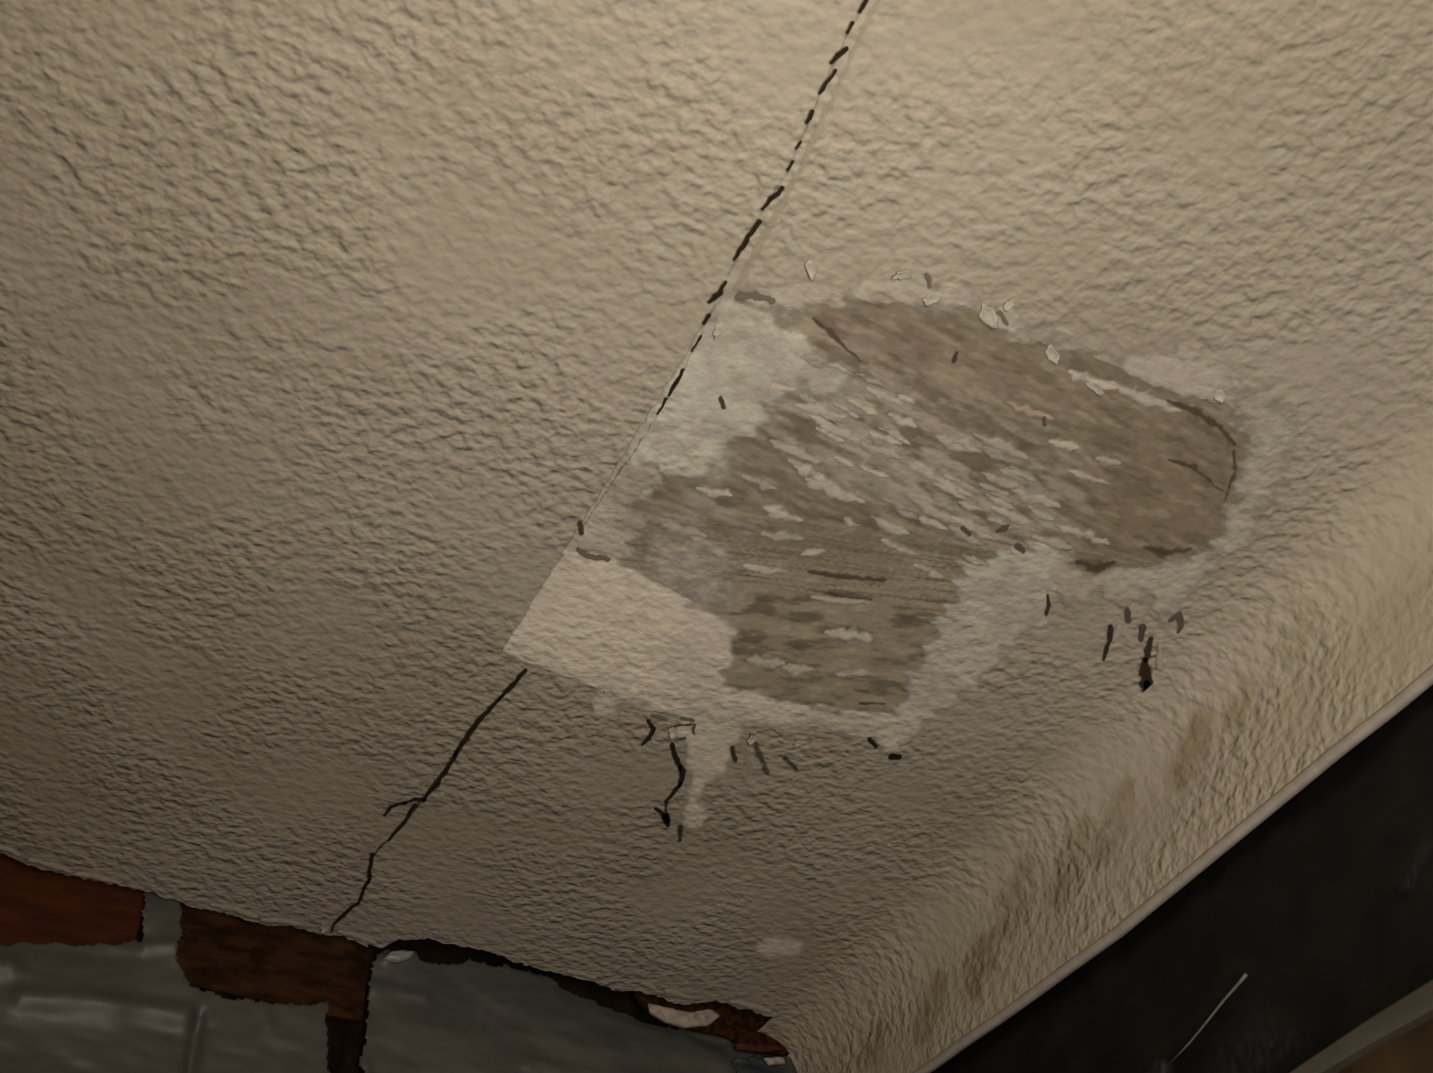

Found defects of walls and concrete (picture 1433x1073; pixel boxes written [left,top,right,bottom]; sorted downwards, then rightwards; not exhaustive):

crack [656,0,875,415]
flaking render [502,260,1298,831]
crack [331,668,528,933]
crack [641,719,696,842]
crack [730,734,798,774]
spalling [0,846,121,884]
spalling [209,903,377,947]
spalling [730,1000,772,1013]